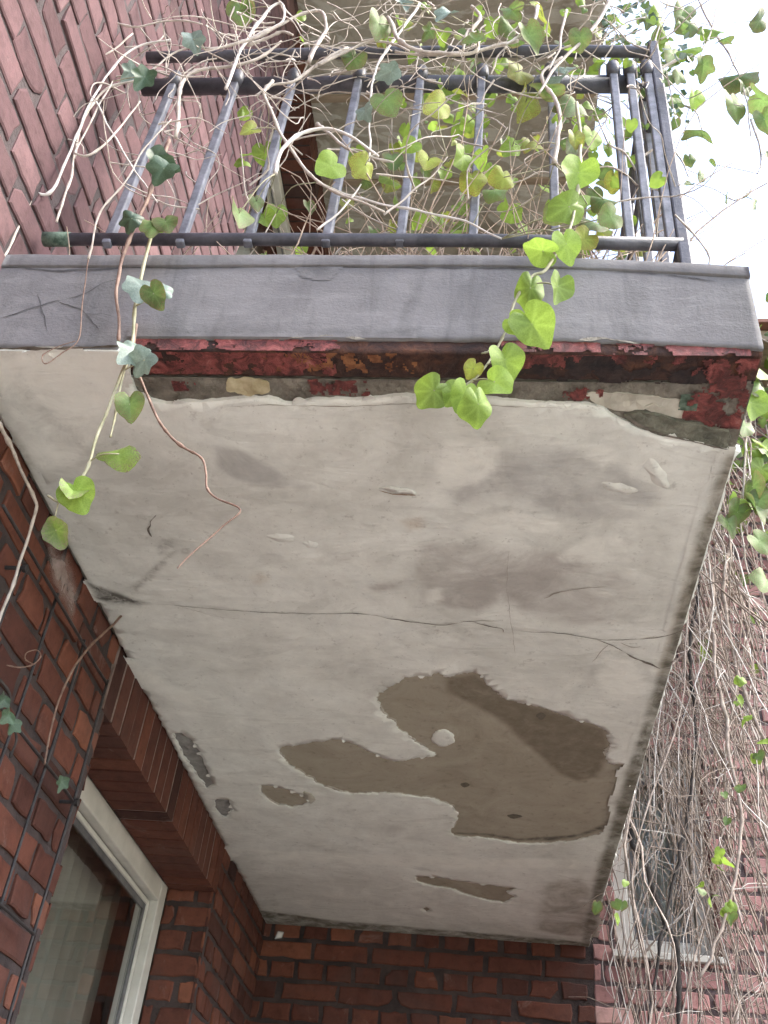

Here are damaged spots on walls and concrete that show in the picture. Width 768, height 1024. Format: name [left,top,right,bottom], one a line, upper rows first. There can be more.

peeling [130,335,418,405]
flaking render [465,337,760,450]
crack [166,554,687,669]
flaking render [173,733,214,787]
flaking render [261,672,623,844]
flaking render [215,799,234,817]
flaking render [416,877,517,902]